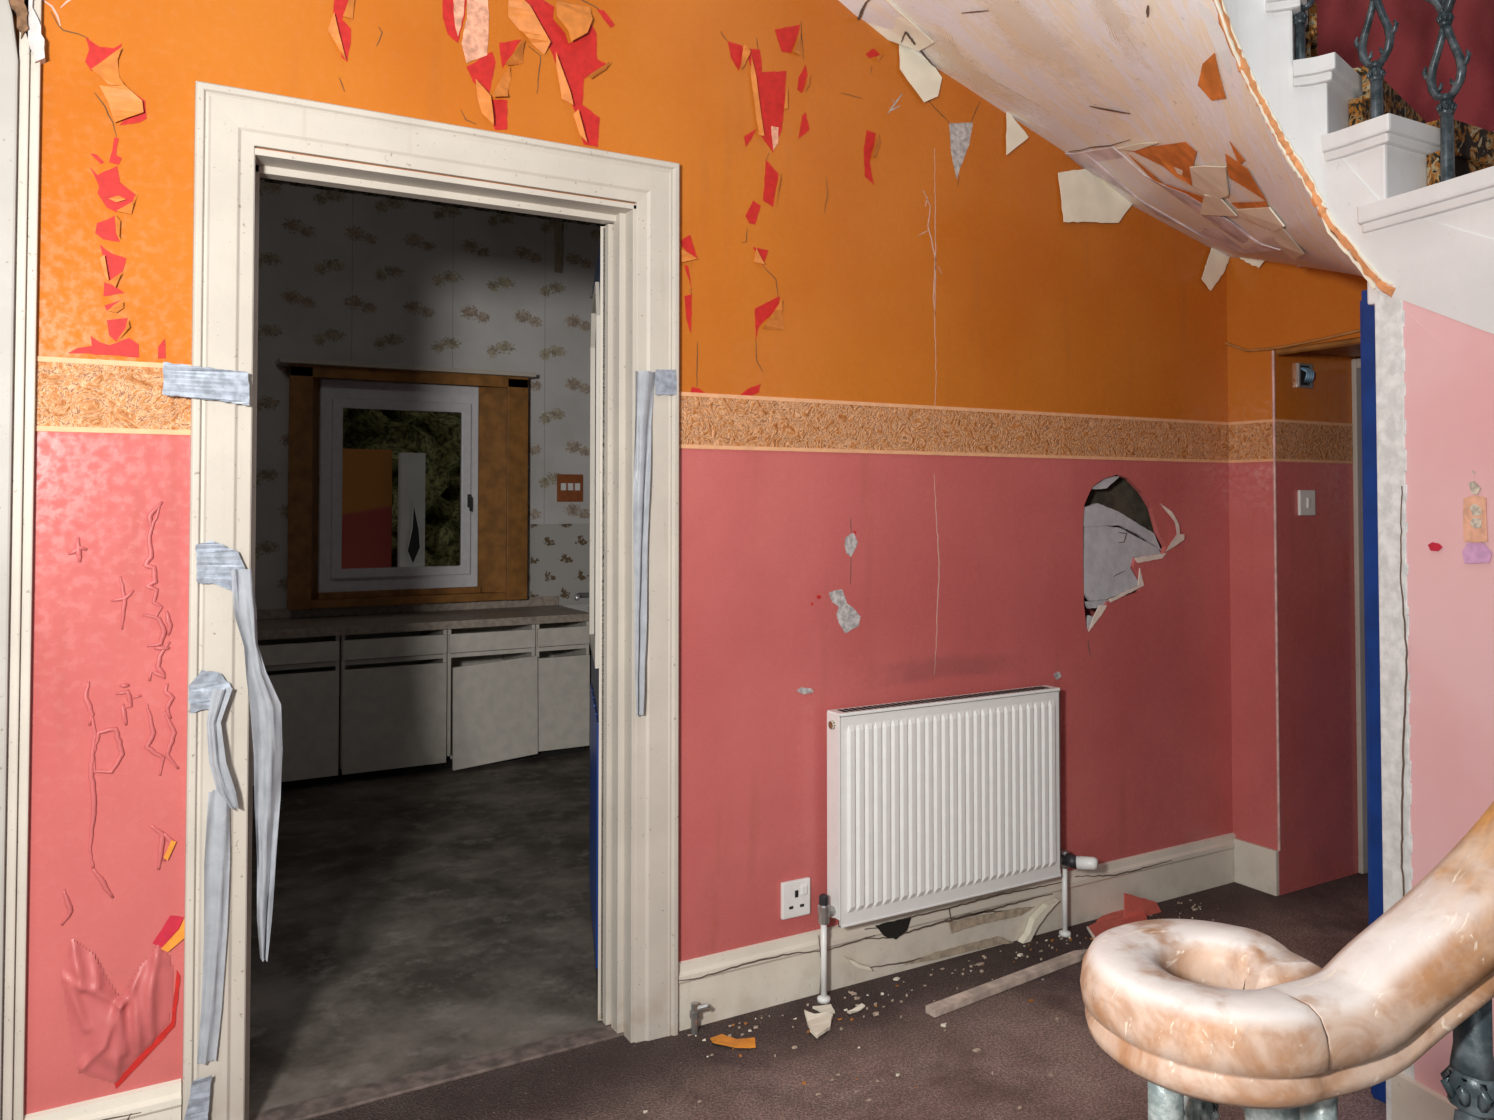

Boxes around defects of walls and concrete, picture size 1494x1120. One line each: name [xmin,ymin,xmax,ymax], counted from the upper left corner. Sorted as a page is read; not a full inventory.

peeling [328,0,354,61]
peeling [442,0,615,147]
peeling [9,0,147,358]
peeling [720,21,810,396]
peeling [158,339,166,359]
flaking render [811,521,861,633]
spalling [1083,475,1184,654]
peeling [905,907,1033,965]